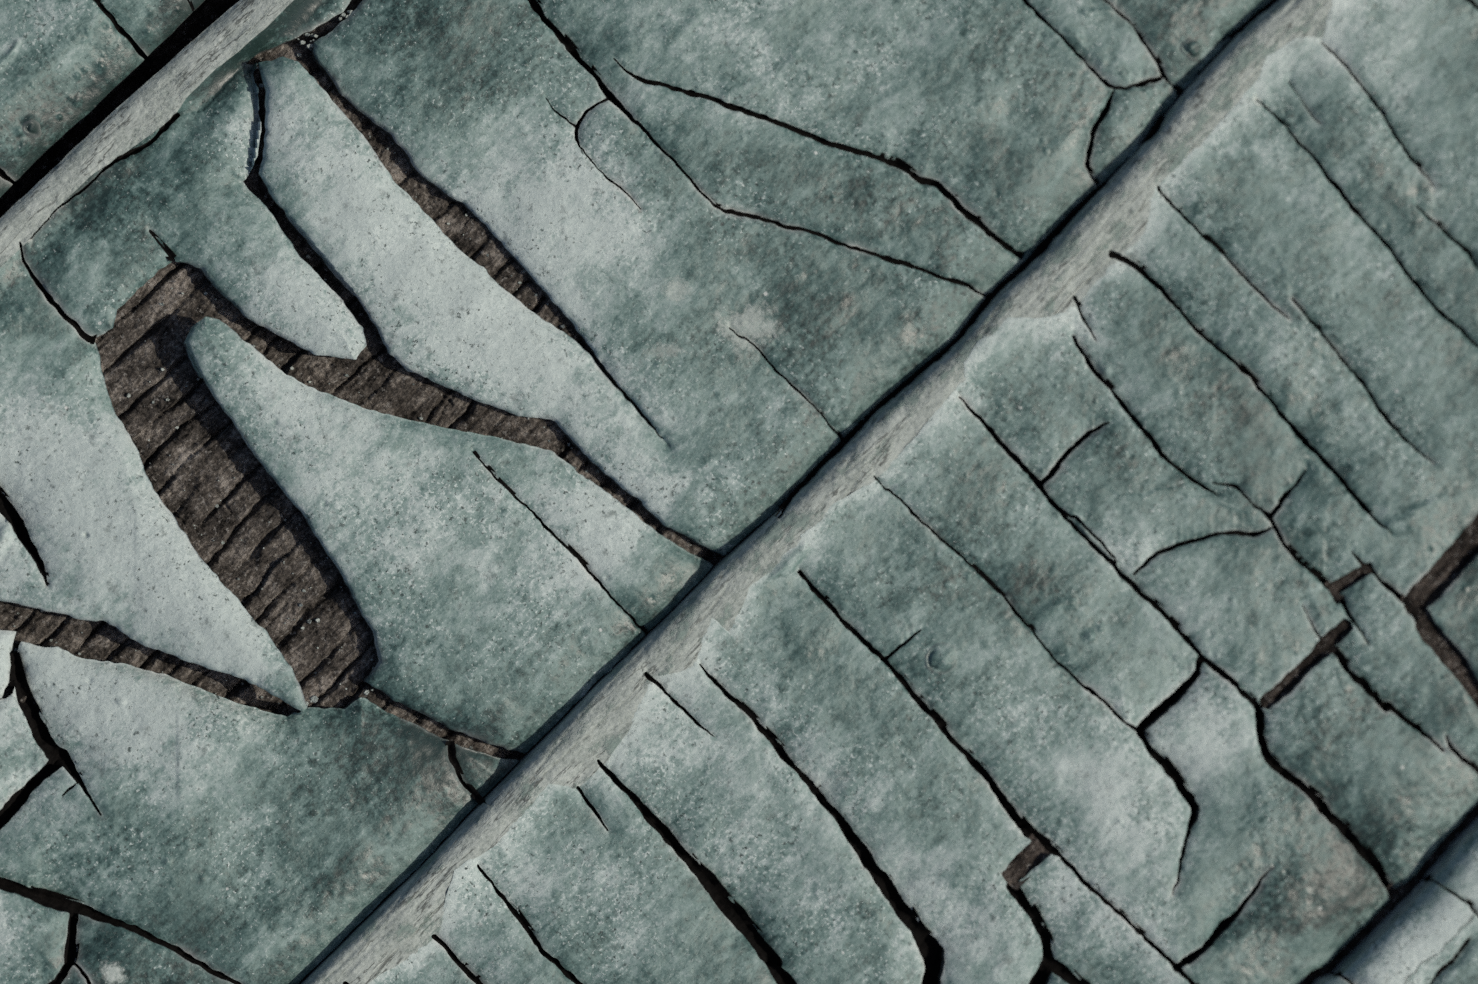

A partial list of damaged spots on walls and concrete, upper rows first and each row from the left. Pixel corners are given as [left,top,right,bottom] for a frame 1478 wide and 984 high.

crack [19,114,178,344]
crack [528,0,1184,519]
peeling [0,0,734,810]
peeling [0,889,69,984]
crack [0,652,101,829]
crack [0,877,242,984]
crack [431,934,483,984]
crack [644,672,714,737]
crack [576,761,796,984]
crack [699,664,943,984]
crack [797,569,1271,984]
crack [874,250,1478,984]